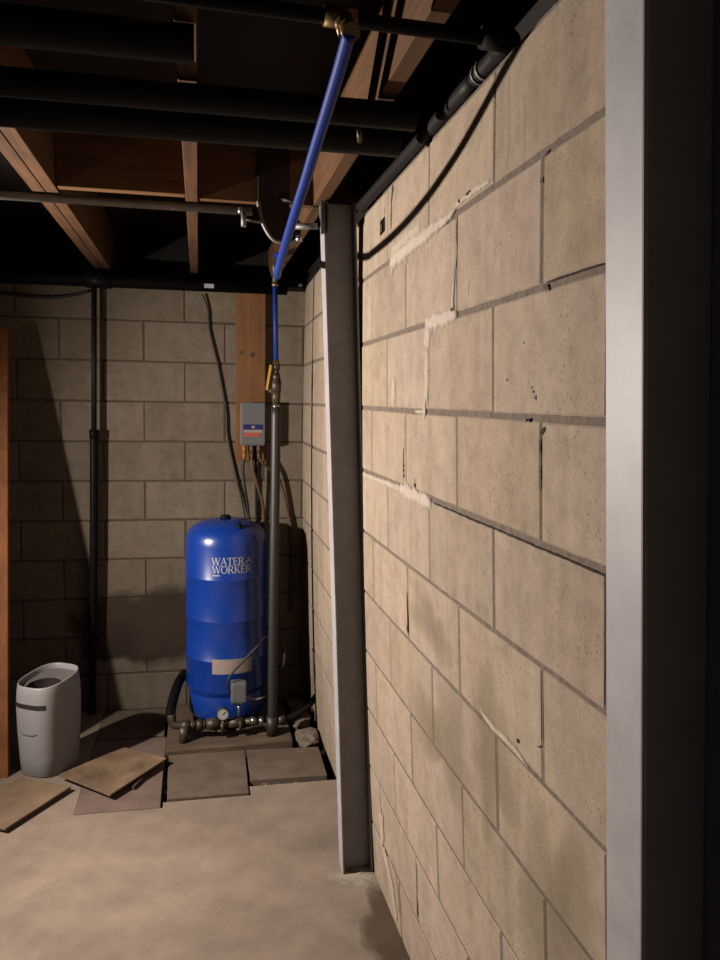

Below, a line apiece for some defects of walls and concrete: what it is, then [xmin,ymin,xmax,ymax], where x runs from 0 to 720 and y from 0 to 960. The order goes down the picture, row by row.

crack [516,675,542,747]